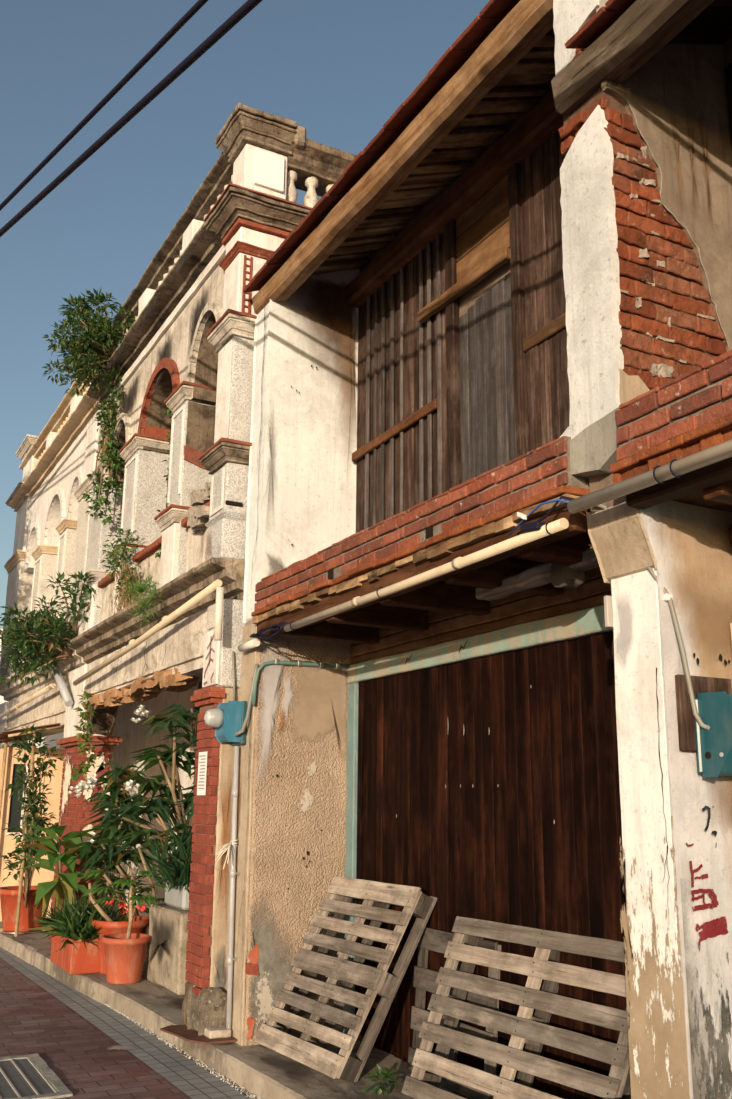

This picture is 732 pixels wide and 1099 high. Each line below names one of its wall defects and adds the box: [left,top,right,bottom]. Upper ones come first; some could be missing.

spalling [605,101,730,390]
spalling [245,944,259,975]
peeling [619,816,732,1099]
spalling [246,1016,255,1040]
damp [689,970,732,1099]